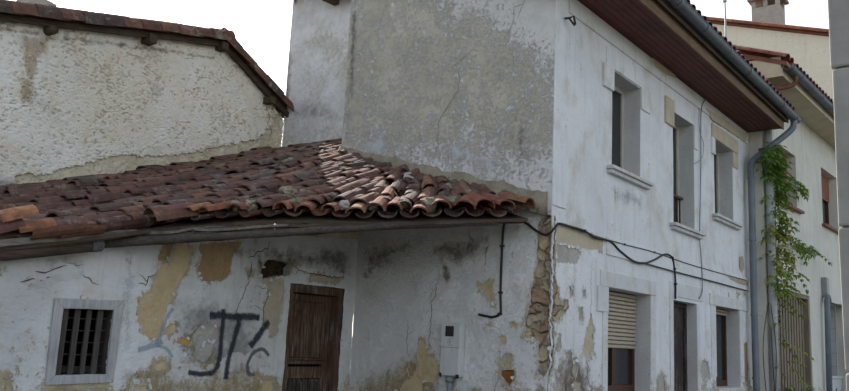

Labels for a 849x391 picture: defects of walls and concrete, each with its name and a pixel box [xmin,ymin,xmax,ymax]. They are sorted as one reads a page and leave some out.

flaking render [137,241,239,340]
spalling [512,215,603,391]
flaking render [177,324,218,362]
flaking render [394,339,439,391]
flaking render [499,336,514,386]